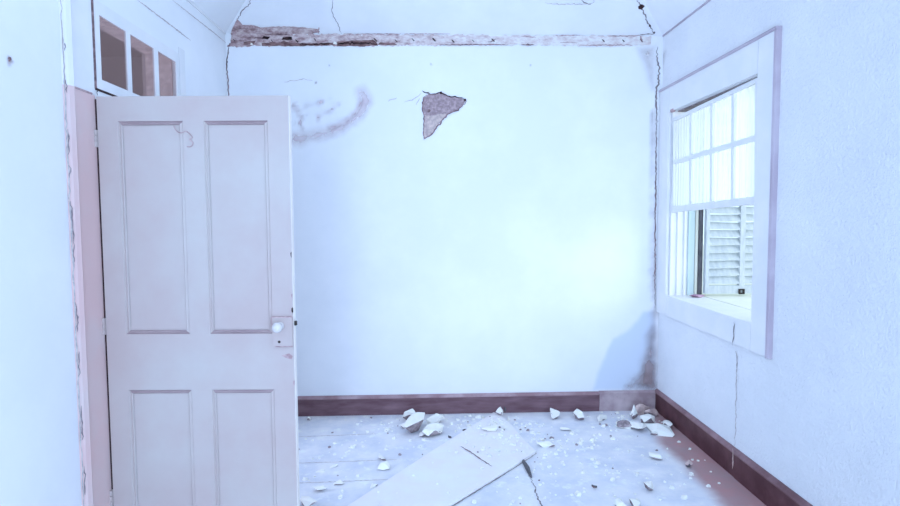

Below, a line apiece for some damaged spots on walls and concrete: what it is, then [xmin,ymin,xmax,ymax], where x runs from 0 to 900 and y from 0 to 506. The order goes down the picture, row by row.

crack [139,0,251,96]
peeling [405,91,467,139]
crack [638,2,660,305]
damp [590,307,658,391]
crack [730,325,738,468]